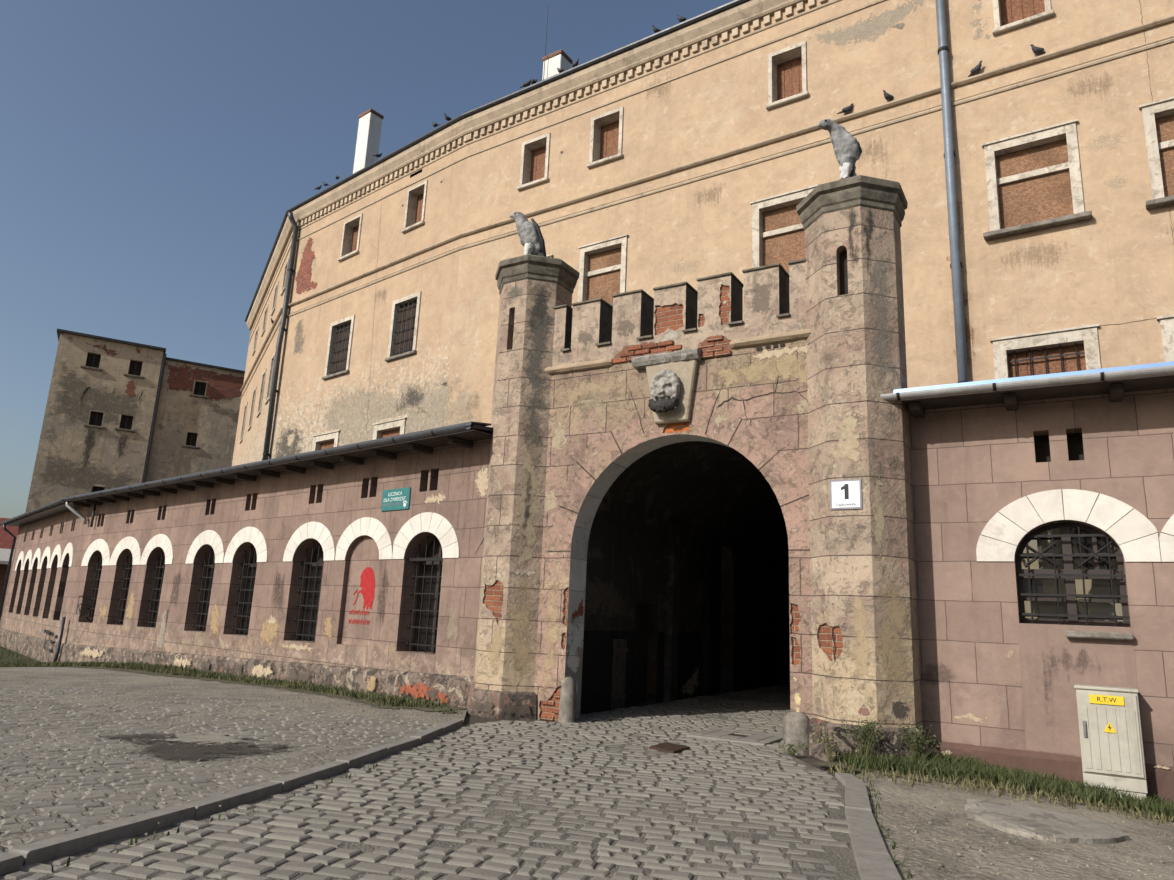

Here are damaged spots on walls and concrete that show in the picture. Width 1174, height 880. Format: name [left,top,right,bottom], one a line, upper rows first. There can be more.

flaking render [295,235,318,294]
leakage [42,367,138,490]
flaking render [166,363,244,402]
leakage [274,426,300,458]
leakage [523,291,553,446]
peeling [516,379,639,565]
flaking render [612,303,684,364]
peeling [698,283,808,415]
crack [705,368,808,434]
flaking render [484,580,504,624]
flaking render [540,582,584,721]
flaking render [819,623,843,660]